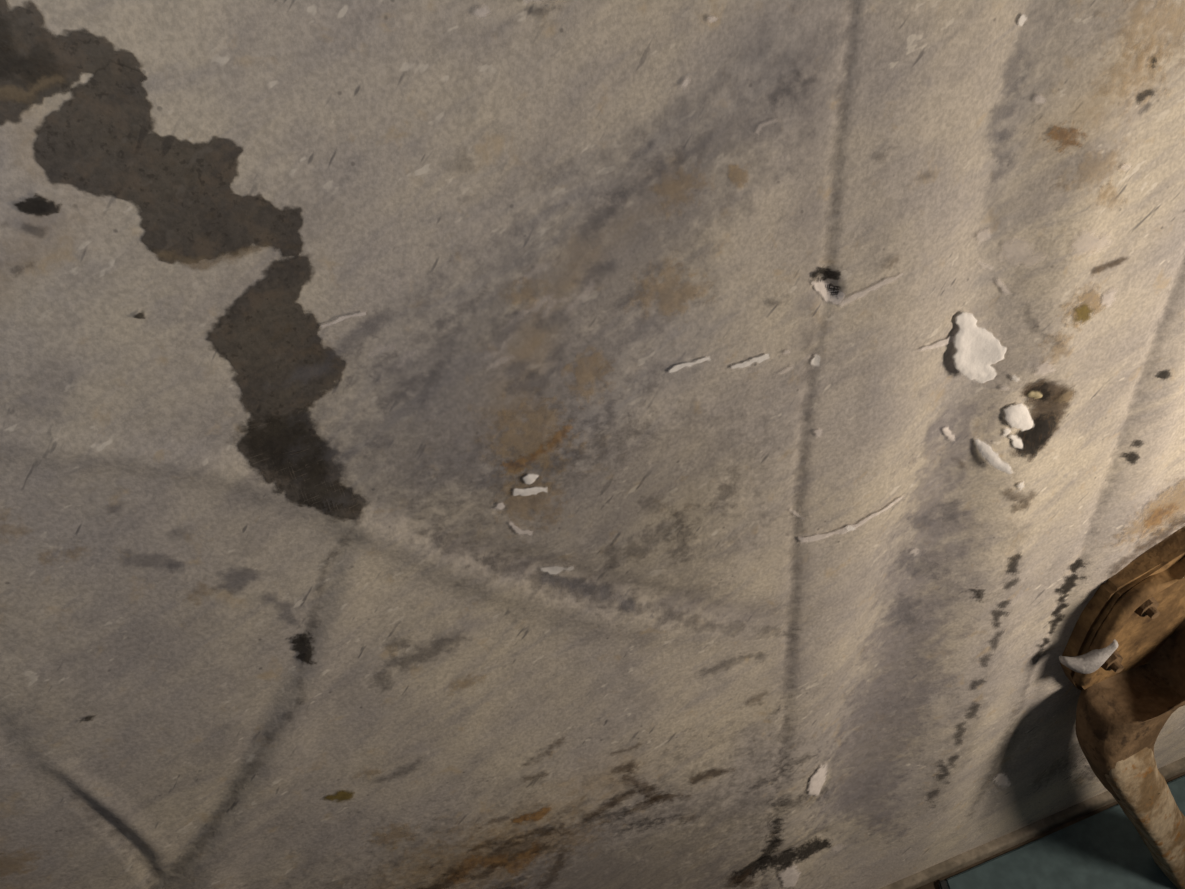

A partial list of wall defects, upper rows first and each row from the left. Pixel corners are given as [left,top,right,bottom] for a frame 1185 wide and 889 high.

damp [0,0,366,520]
spalling [812,267,902,306]
peeling [922,313,1074,459]
peeling [975,439,1024,489]
crack [292,632,316,664]